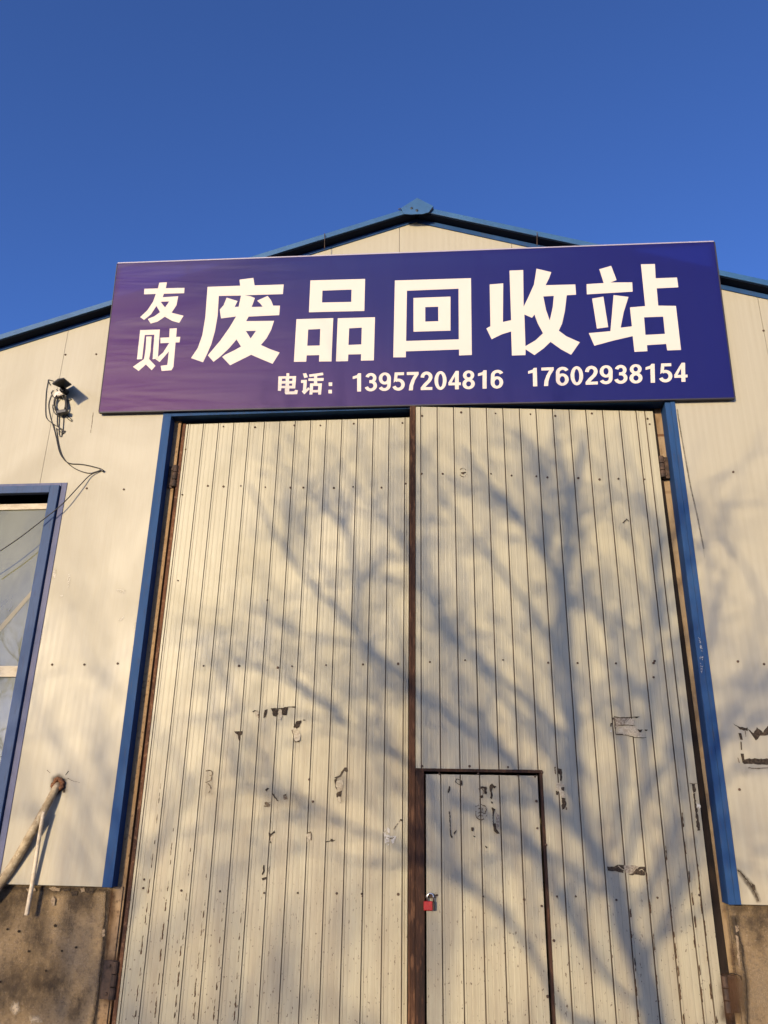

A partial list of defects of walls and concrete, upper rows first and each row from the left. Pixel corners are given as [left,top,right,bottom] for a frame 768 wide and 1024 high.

peeling [254,706,304,742]
peeling [734,724,768,740]
peeling [481,784,500,834]
peeling [607,865,648,884]